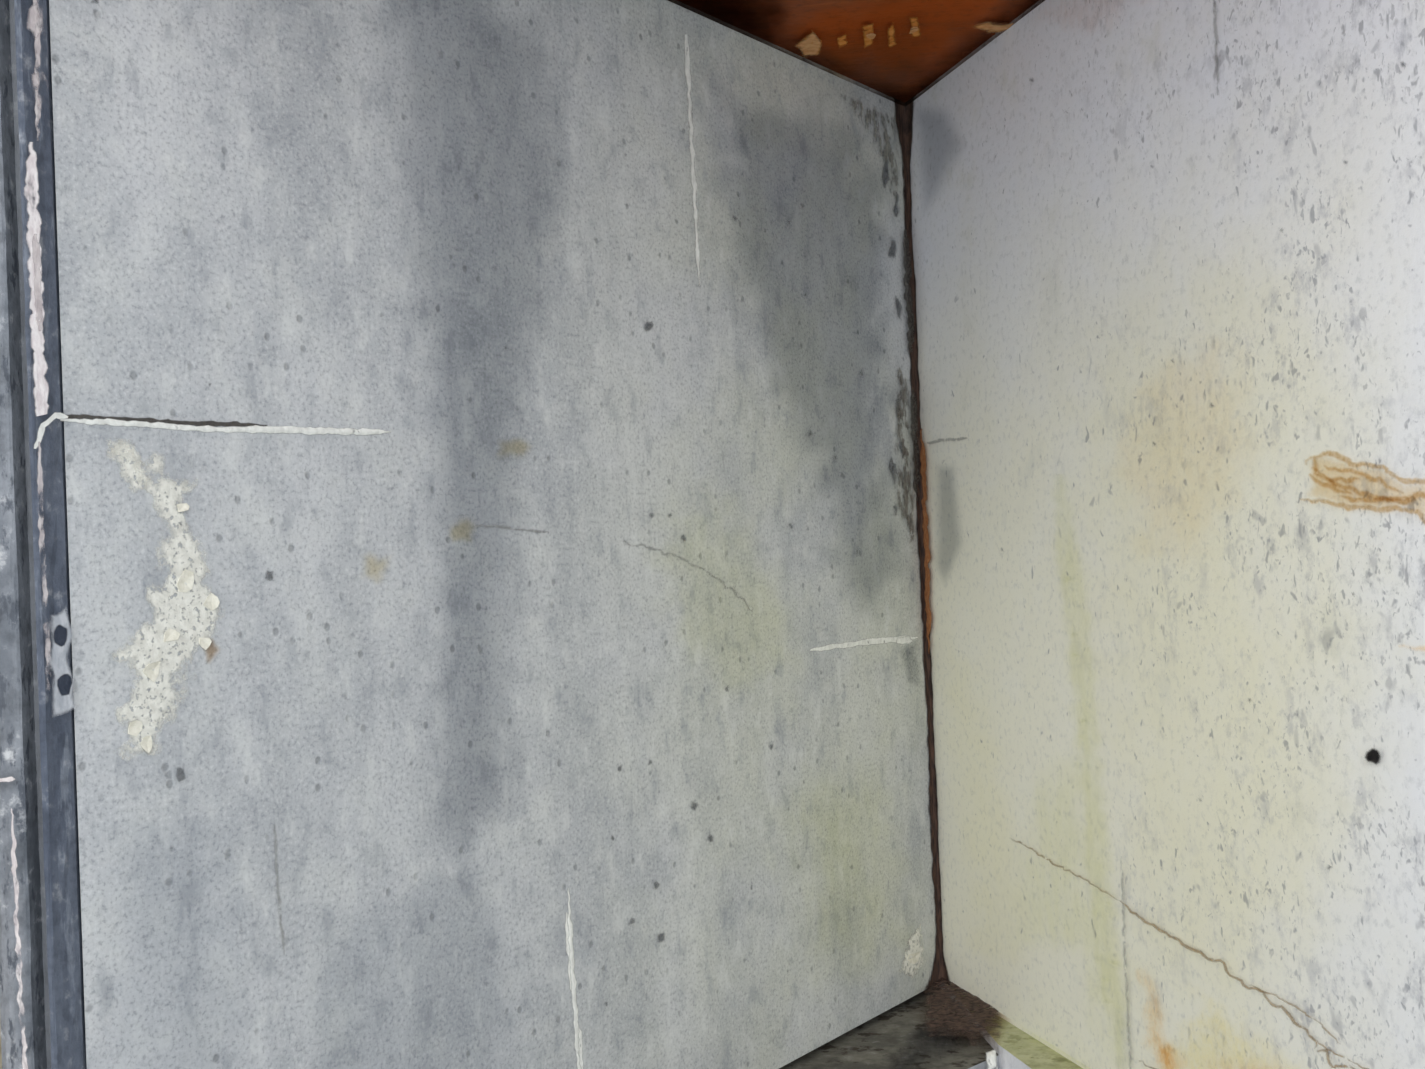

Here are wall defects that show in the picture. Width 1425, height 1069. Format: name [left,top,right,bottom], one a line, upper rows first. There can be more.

water stain [668,0,851,83]
peeling [797,33,847,56]
peeling [863,18,920,47]
peeling [975,23,1013,32]
water stain [684,34,700,286]
crack [66,414,267,427]
corrosion [895,97,950,990]
peeling [109,441,220,756]
crack [1016,841,1368,1069]